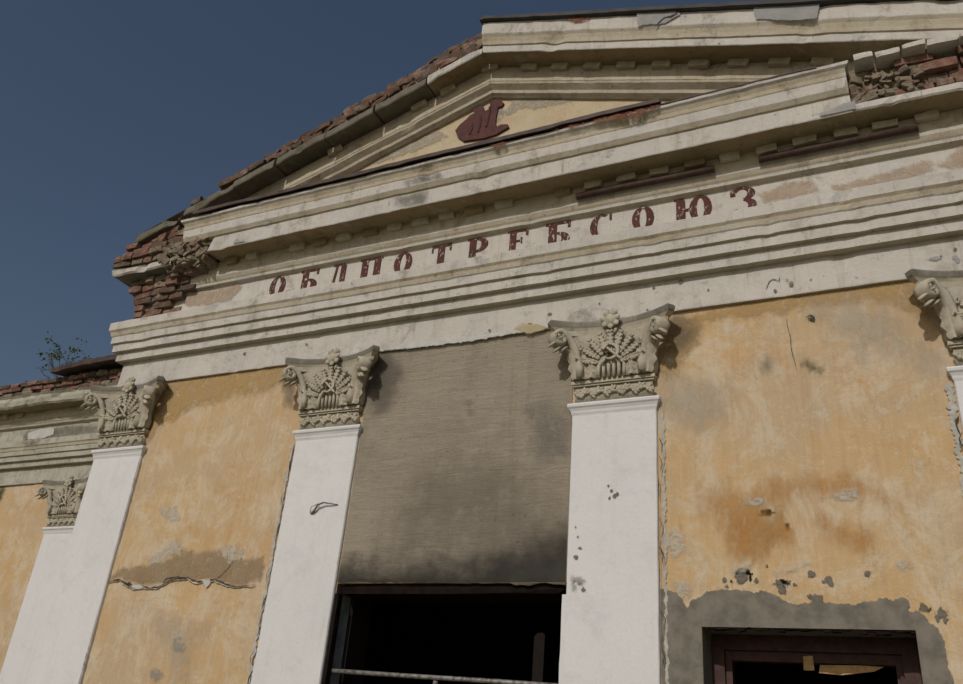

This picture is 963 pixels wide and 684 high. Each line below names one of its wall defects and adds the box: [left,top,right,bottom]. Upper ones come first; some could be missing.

spalling [217,32,483,189]
spalling [820,30,963,116]
spalling [112,196,241,319]
crack [944,384,963,496]
peeling [113,541,264,584]
crack [109,443,294,684]
flaking render [707,627,916,636]